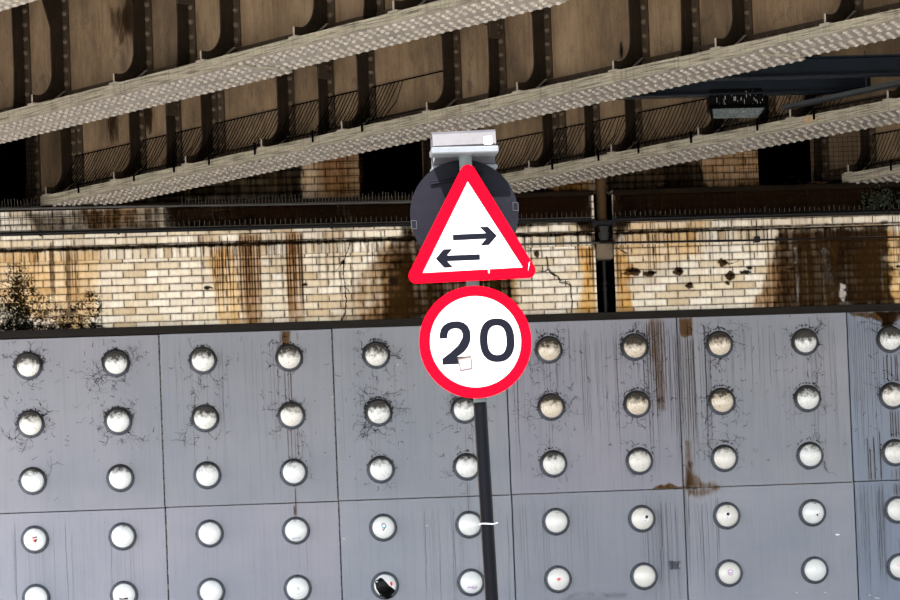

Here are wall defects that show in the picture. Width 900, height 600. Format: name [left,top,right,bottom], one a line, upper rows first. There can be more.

water stain [0,263,103,331]
water stain [28,165,467,319]
water stain [479,279,512,299]
crack [541,256,573,313]
water stain [514,160,900,307]
rust [680,320,696,431]